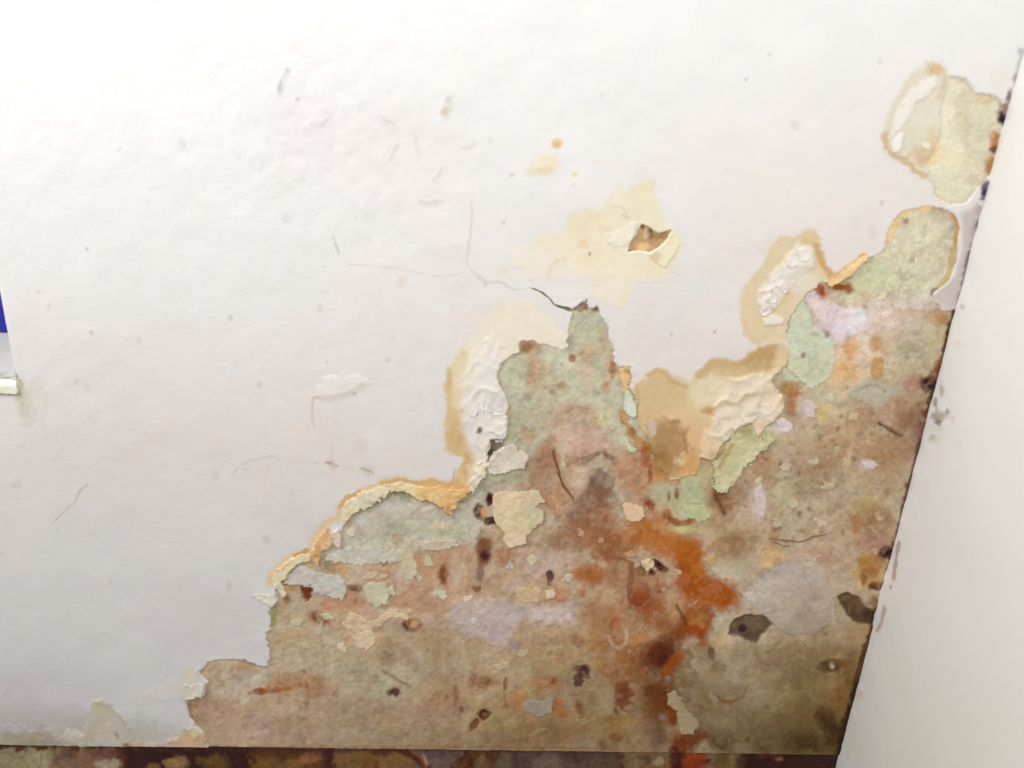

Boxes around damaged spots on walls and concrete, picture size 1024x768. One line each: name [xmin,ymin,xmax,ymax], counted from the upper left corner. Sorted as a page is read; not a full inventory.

leakage [264,295,569,591]
crack [352,208,571,311]
peeling [119,77,1002,755]
leakage [500,172,684,309]
leakage [629,226,876,481]
corrosion [636,527,745,753]